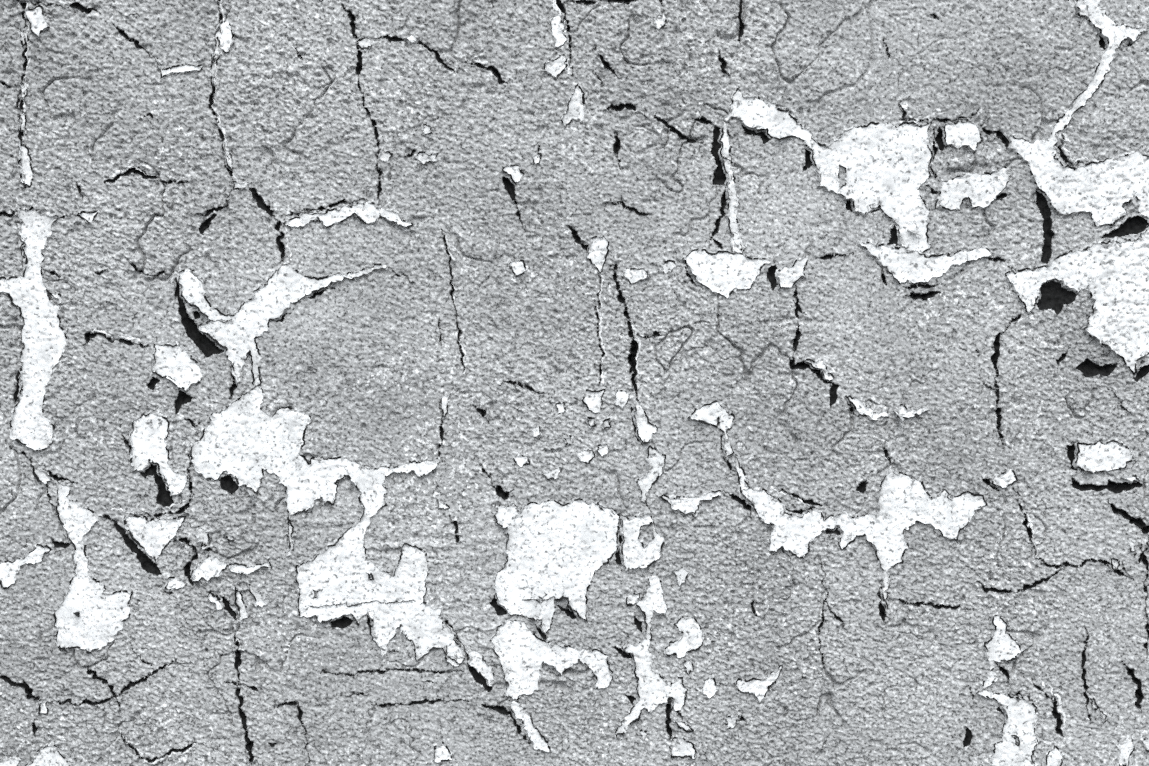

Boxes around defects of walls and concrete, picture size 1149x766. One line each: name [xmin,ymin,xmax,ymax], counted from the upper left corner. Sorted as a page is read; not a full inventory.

crack [197,0,285,262]
crack [342,3,508,209]
peeling [501,145,542,229]
crack [552,0,714,169]
peeling [621,0,1149,381]
crack [568,225,660,399]
peeling [0,198,1020,759]
peeling [1067,439,1143,493]
peeling [0,743,70,766]
crack [0,651,197,765]
peeling [970,613,1066,766]
crack [893,499,1149,721]